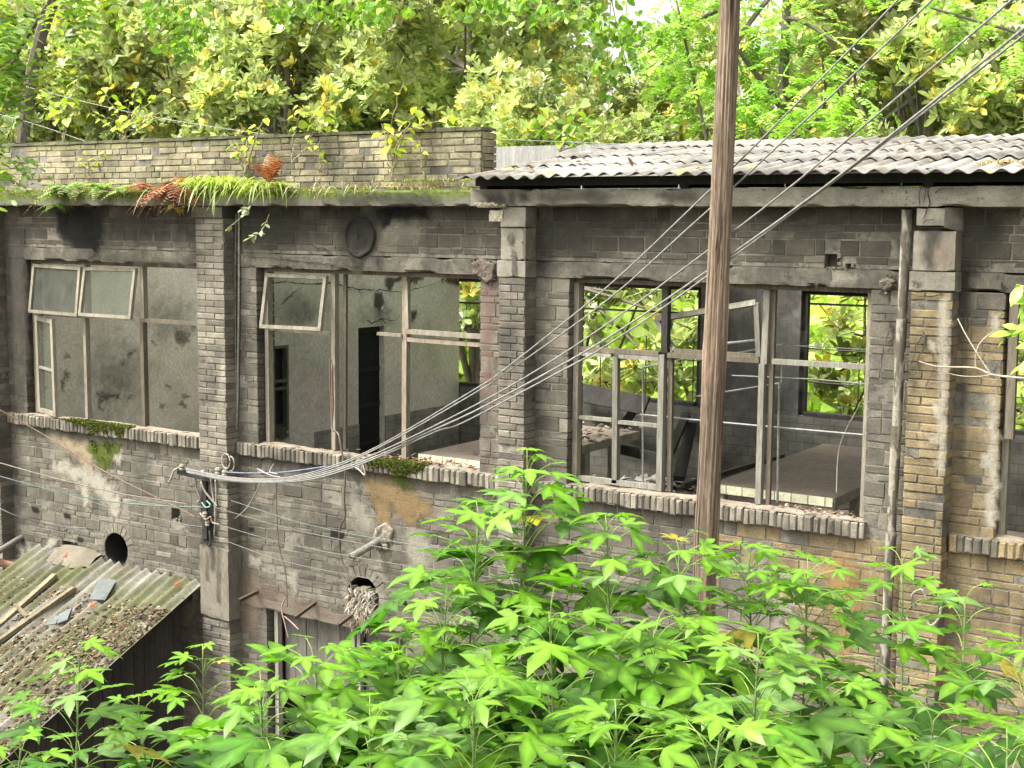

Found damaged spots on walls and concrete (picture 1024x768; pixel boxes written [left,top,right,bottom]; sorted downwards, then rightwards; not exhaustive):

leakage [57,212,190,267]
crack [247,245,444,324]
spalling [470,258,497,284]
leakage [930,303,947,471]
leakage [53,438,121,516]
leakage [982,399,998,526]